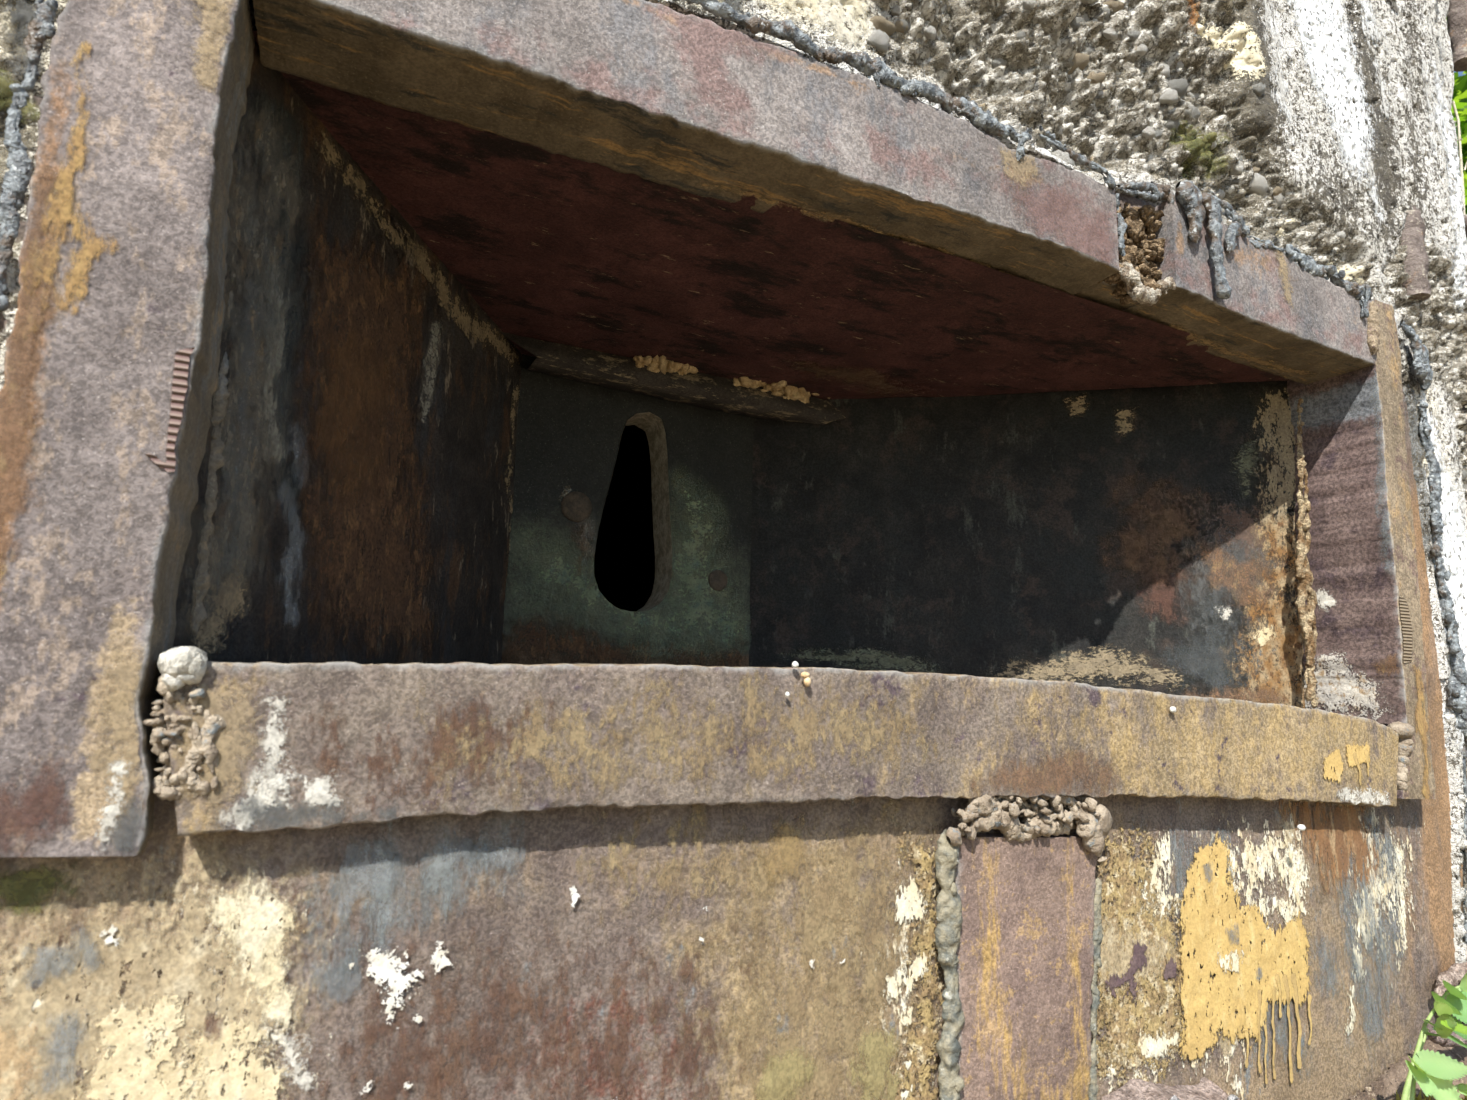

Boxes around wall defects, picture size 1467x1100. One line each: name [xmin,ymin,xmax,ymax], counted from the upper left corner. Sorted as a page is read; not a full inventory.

rust [1000,148,1177,306]
rust [0,87,117,571]
rust [1141,499,1306,709]
rust [89,650,144,819]
rust [173,682,261,831]
rust [366,615,937,811]
peeling [349,941,456,1029]
rust [339,940,727,1100]
rust [890,831,945,1100]
peeling [1091,820,1249,1100]
peeling [1192,810,1311,944]
rust [1278,800,1379,887]